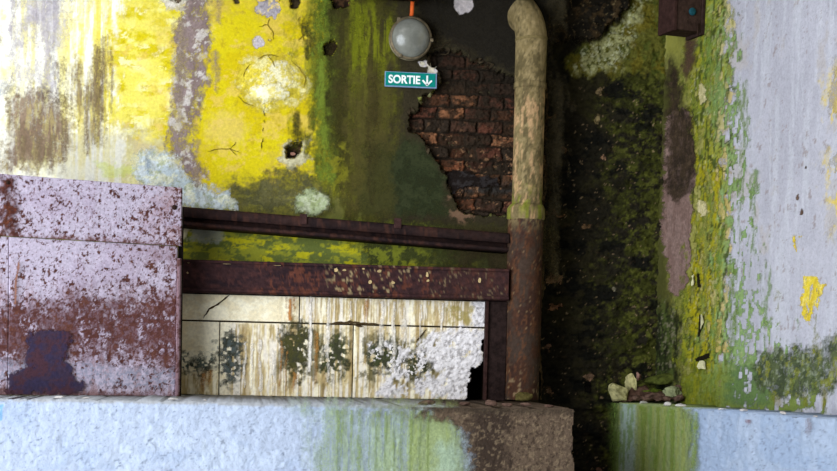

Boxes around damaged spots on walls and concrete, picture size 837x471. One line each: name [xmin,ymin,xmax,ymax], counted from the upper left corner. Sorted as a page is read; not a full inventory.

peeling [255,0,301,20]
water stain [0,0,113,172]
water stain [133,0,333,217]
spalling [277,138,311,170]
flaking render [406,48,515,217]
rust [0,176,18,233]
peeling [718,0,837,415]
rust [3,330,87,394]
water stain [182,328,262,391]
water stain [271,297,350,386]
water stain [366,301,433,380]
spalling [413,341,575,471]